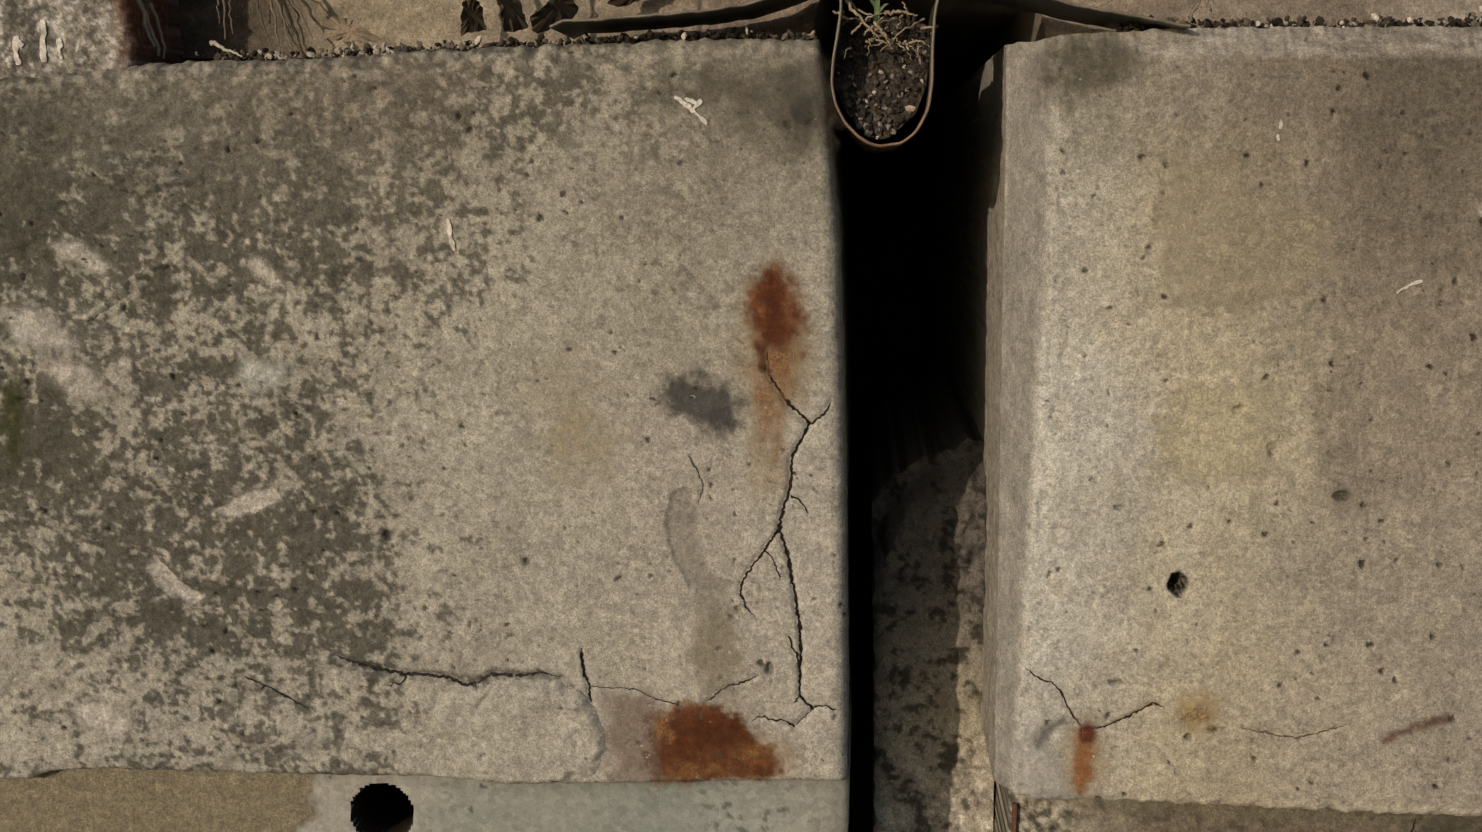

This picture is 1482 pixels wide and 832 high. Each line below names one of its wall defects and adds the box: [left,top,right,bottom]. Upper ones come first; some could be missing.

corrosion [119,0,172,56]
corrosion [745,263,806,431]
crack [688,455,703,503]
crack [739,352,836,727]
crack [337,649,757,707]
crack [1025,668,1164,729]
corrosion [607,697,784,785]
corrosion [1072,724,1097,794]